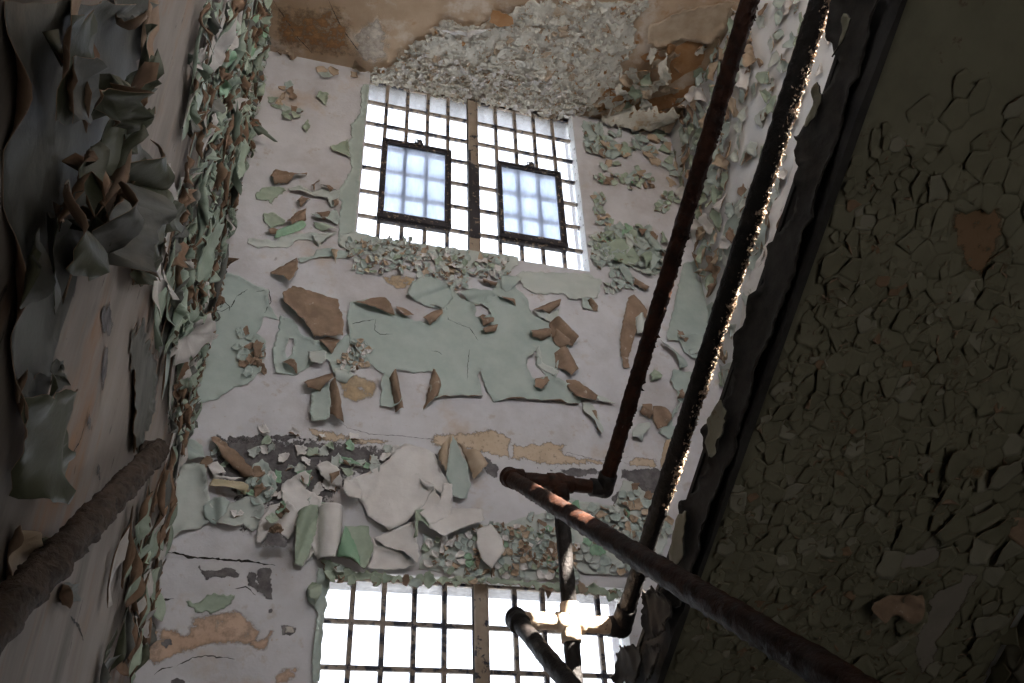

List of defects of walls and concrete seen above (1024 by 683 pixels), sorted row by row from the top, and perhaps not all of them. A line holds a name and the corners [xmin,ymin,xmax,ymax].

crack [168,552,273,595]
peeling [2,0,736,683]
peeling [568,0,803,542]
peeling [611,585,809,683]
peeling [654,0,1024,683]